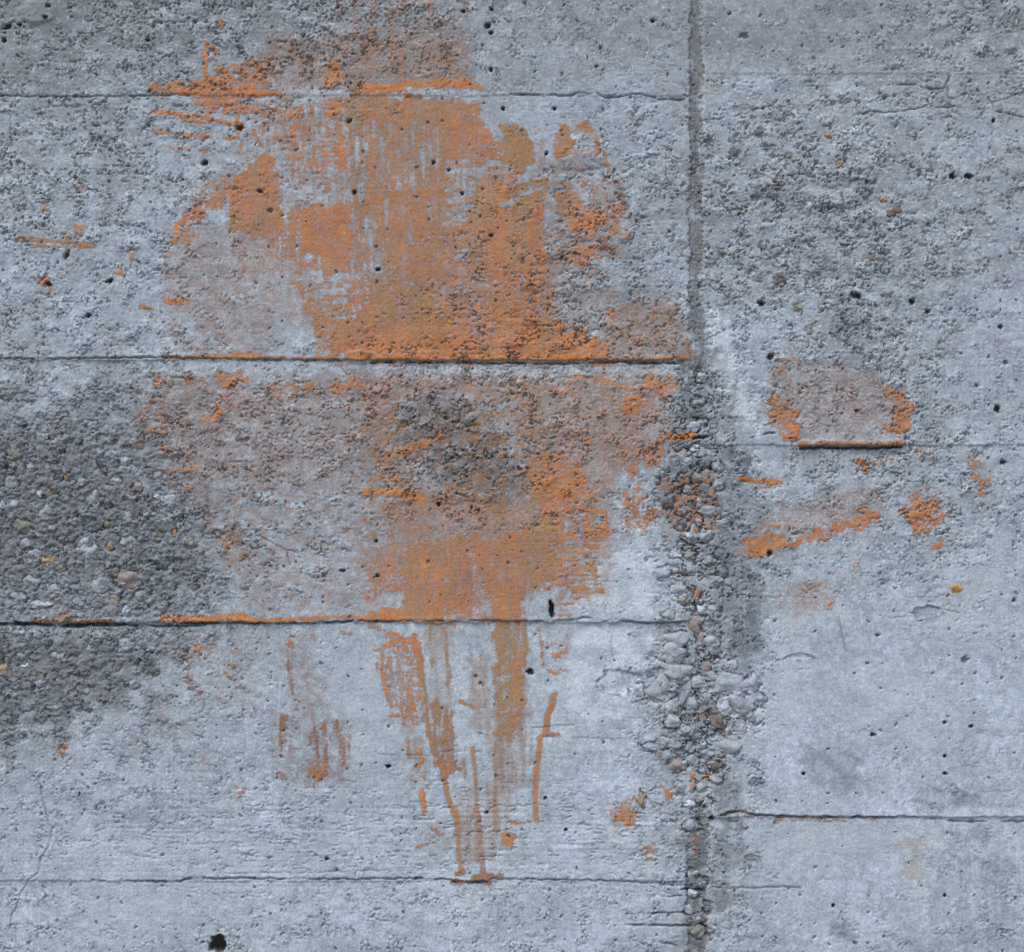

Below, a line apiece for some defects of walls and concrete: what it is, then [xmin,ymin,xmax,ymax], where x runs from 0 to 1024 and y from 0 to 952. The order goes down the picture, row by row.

rust [17,236,94,249]
rust [274,707,297,755]
rust [307,719,350,787]